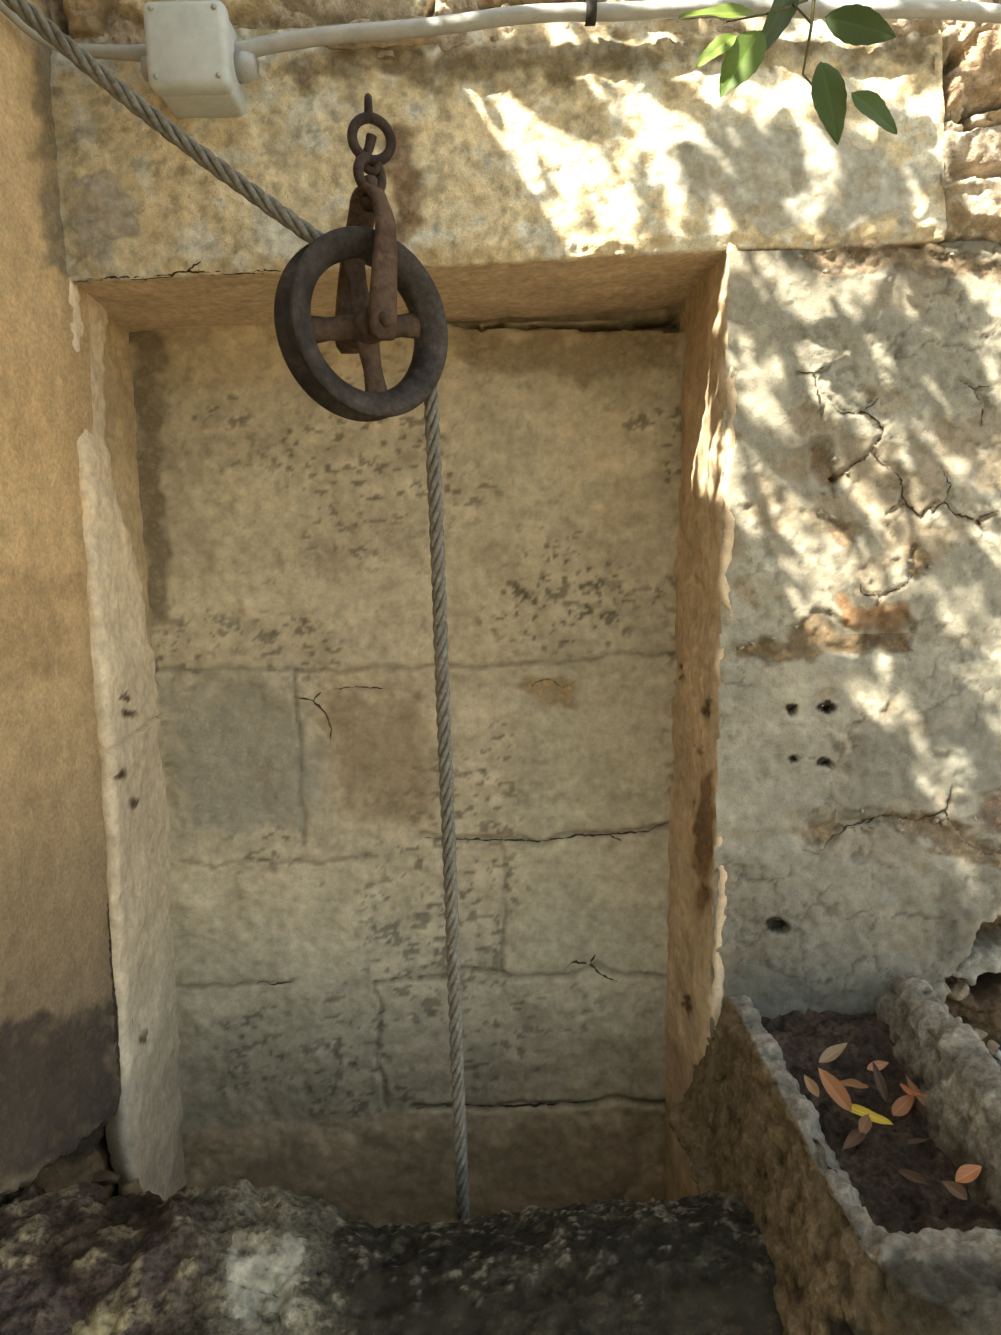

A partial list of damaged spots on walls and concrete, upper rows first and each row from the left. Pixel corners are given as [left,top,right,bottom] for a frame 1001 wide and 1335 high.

crack [797,366,994,532]
crack [801,785,1001,855]
spalling [943,913,1001,1072]